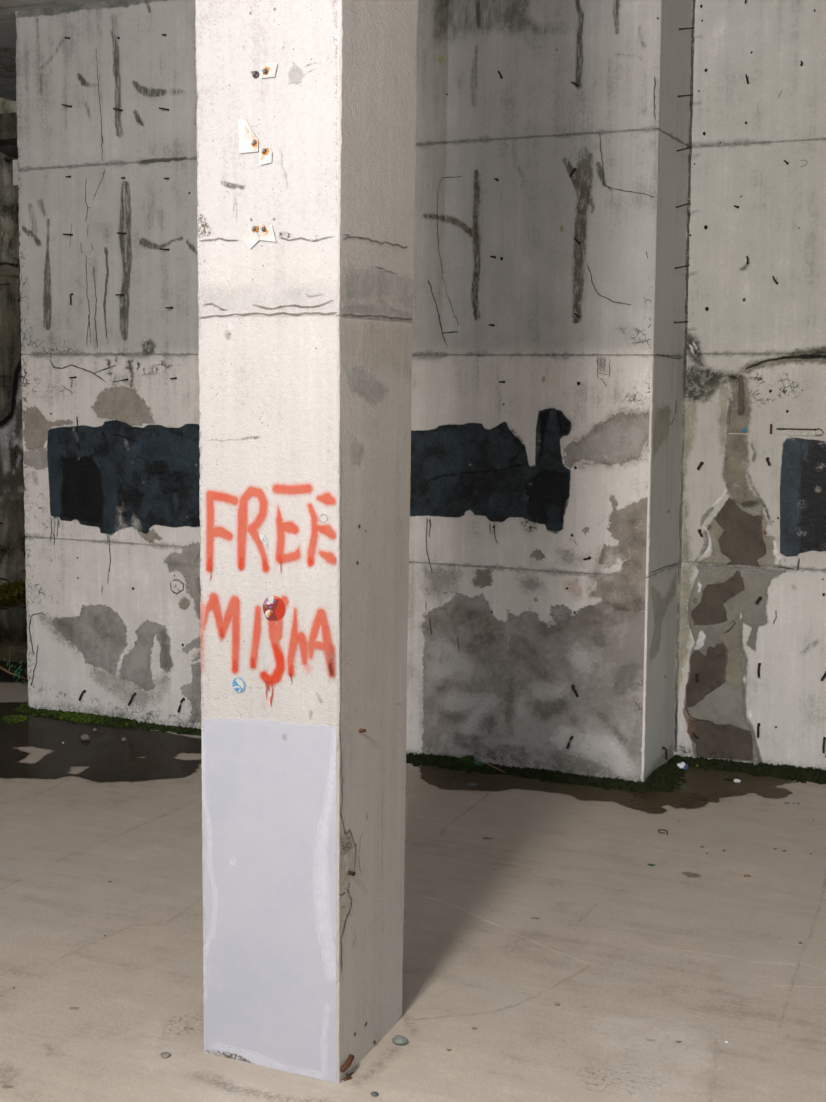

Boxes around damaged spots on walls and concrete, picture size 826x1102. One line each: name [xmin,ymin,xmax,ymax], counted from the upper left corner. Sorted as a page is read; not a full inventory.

crack [198,215,238,241]
crack [279,232,408,337]
crack [0,358,21,428]
water stain [0,323,74,513]
peeling [27,601,173,705]
crack [337,570,345,663]
spalling [341,827,355,936]